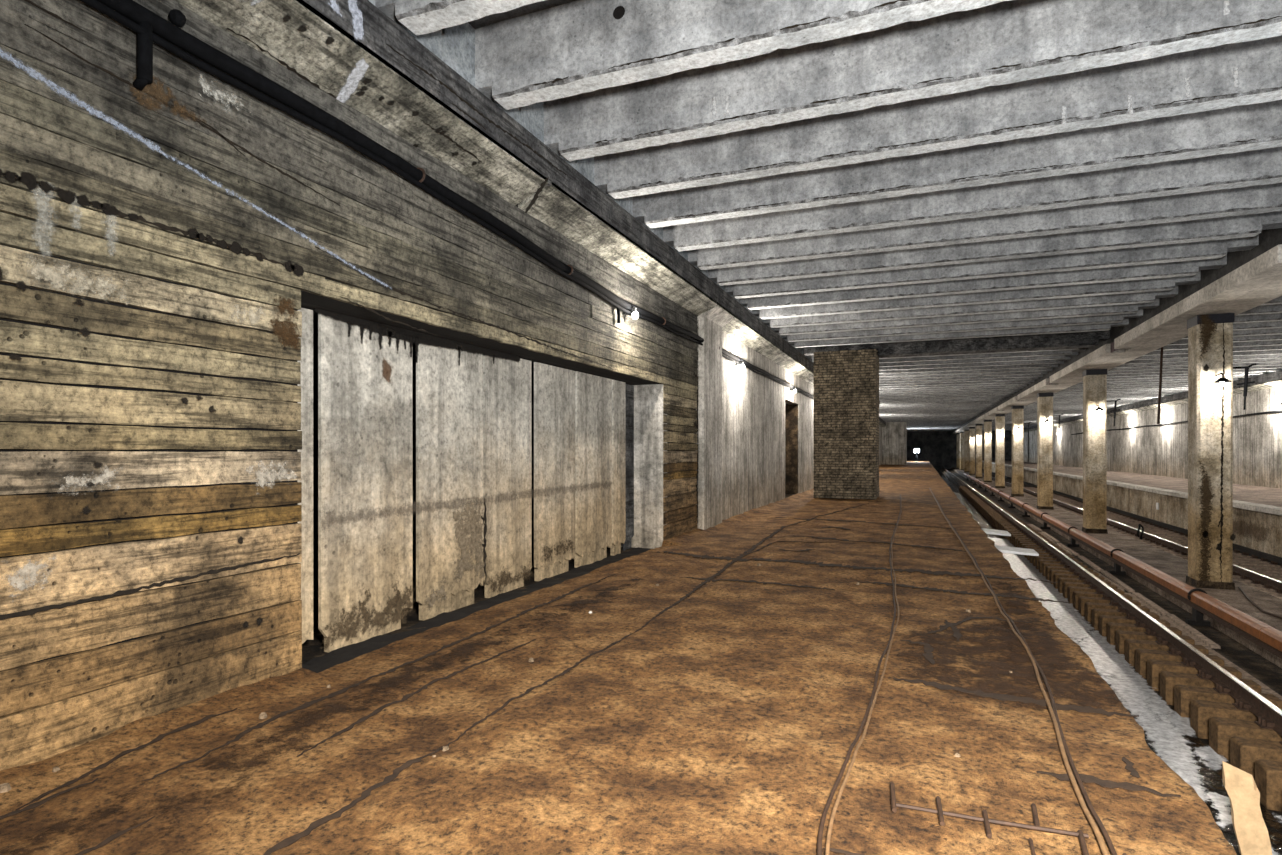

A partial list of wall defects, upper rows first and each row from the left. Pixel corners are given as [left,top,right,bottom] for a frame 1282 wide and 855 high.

crack [0,574,615,820]
crack [75,816,155,855]